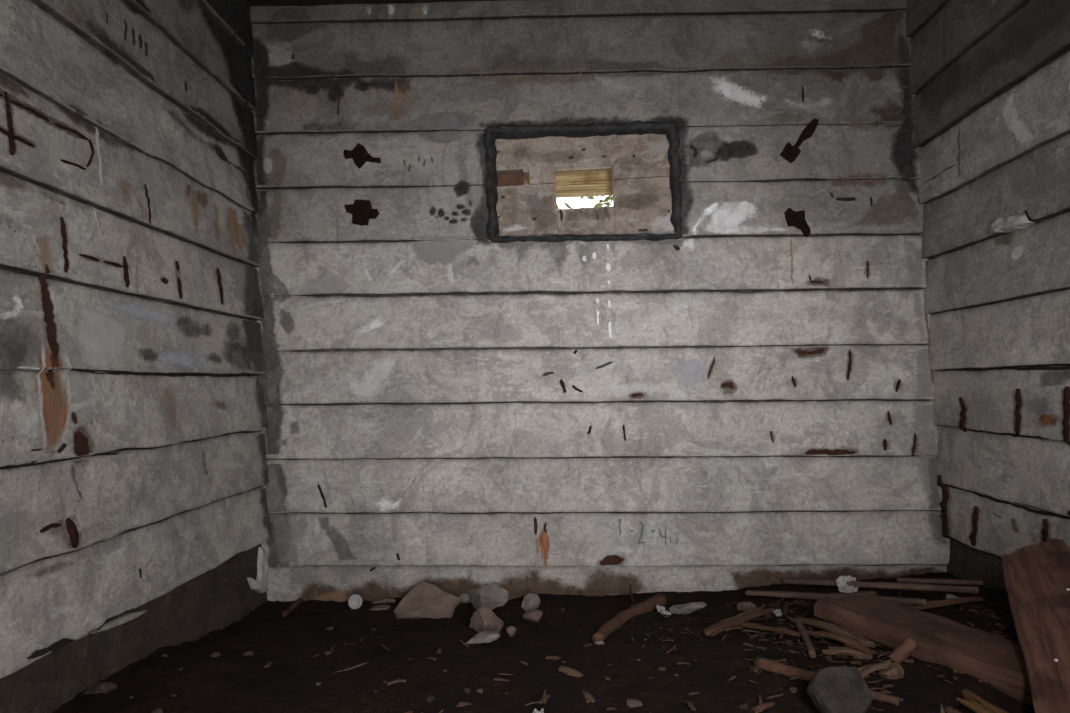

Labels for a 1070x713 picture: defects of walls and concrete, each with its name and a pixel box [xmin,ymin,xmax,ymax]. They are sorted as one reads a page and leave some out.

damp [465,58,663,84]
damp [712,57,765,107]
damp [430,118,632,284]
damp [630,117,783,249]
damp [0,296,23,320]
rust [38,239,70,442]
rust [533,517,549,564]
damp [300,578,485,602]
damp [501,571,642,600]
damp [733,567,941,589]